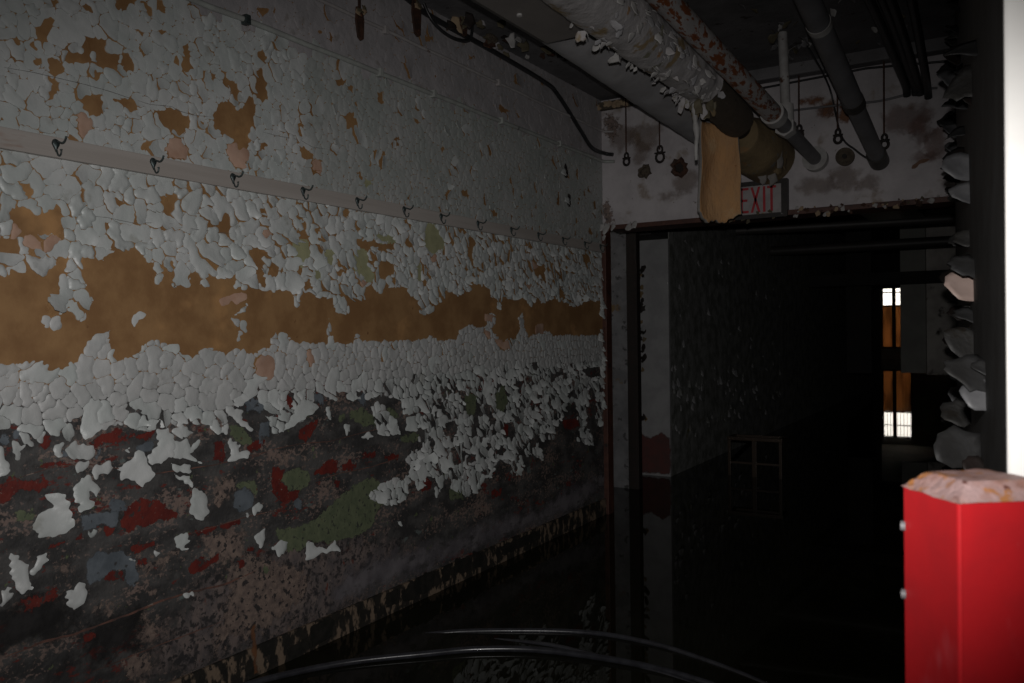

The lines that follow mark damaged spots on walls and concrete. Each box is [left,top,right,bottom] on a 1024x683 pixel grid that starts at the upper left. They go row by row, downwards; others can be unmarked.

peeling [446,12,568,61]
flaking render [0,0,325,182]
peeling [335,59,399,169]
peeling [728,25,978,224]
flaking render [0,149,637,538]
peeling [933,229,986,471]
peeling [174,533,190,551]
peeling [254,528,288,557]
peeling [305,540,341,560]
peeling [0,553,49,607]
peeling [65,582,87,610]